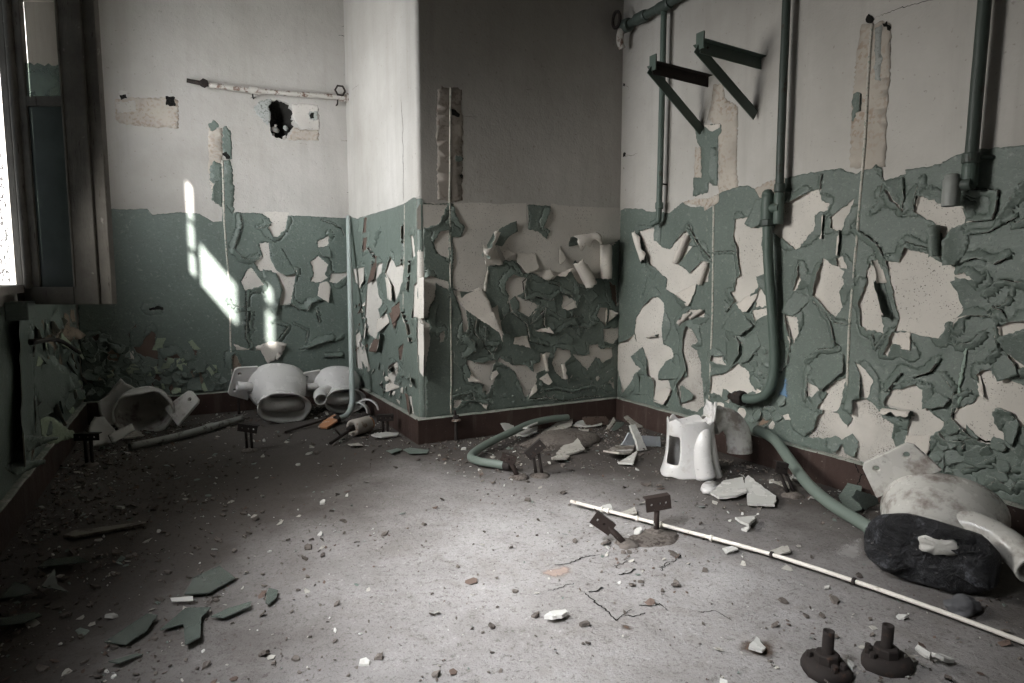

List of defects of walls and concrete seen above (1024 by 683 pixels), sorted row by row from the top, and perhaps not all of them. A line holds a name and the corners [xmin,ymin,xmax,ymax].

flaking render [849,20,892,170]
peeling [4,84,1024,491]
crack [548,555,681,620]